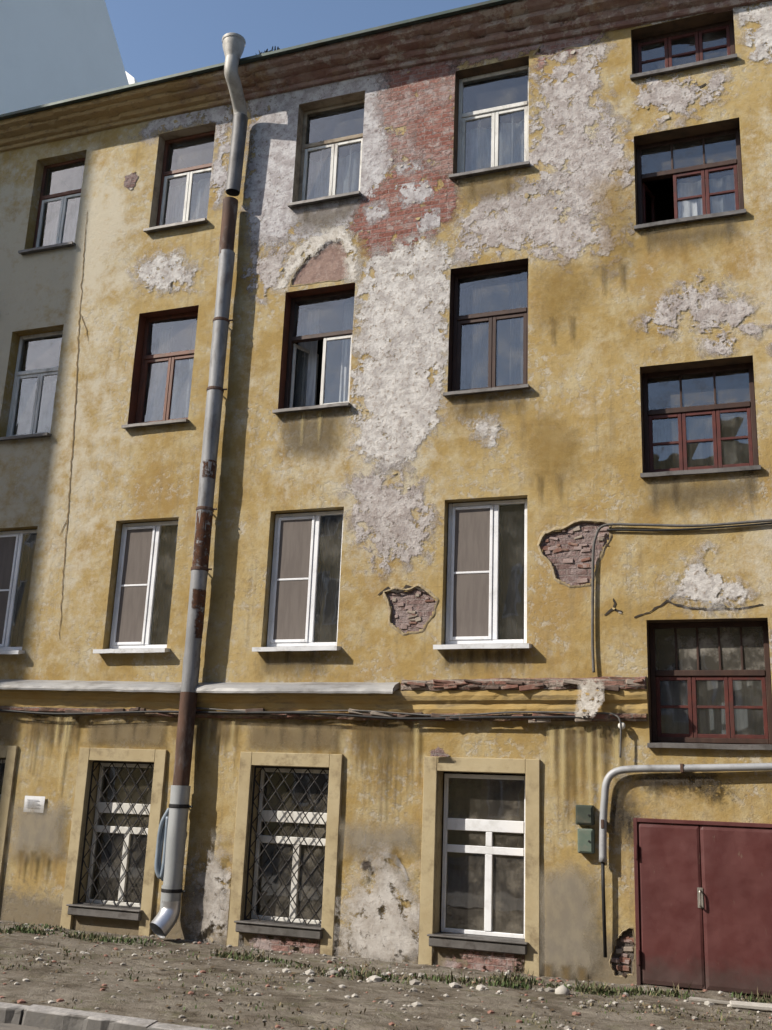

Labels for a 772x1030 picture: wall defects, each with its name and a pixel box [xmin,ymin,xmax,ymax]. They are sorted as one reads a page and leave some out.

peeling [733,1,772,63]
peeling [634,69,728,133]
peeling [241,32,635,573]
rust [202,459,217,479]
rust [191,589,206,638]
rust [192,511,213,568]
spalling [378,583,440,636]
spalling [537,519,613,588]
crack [604,593,763,618]
peeling [674,545,756,611]
spalling [401,676,646,723]
leakage [549,727,602,805]